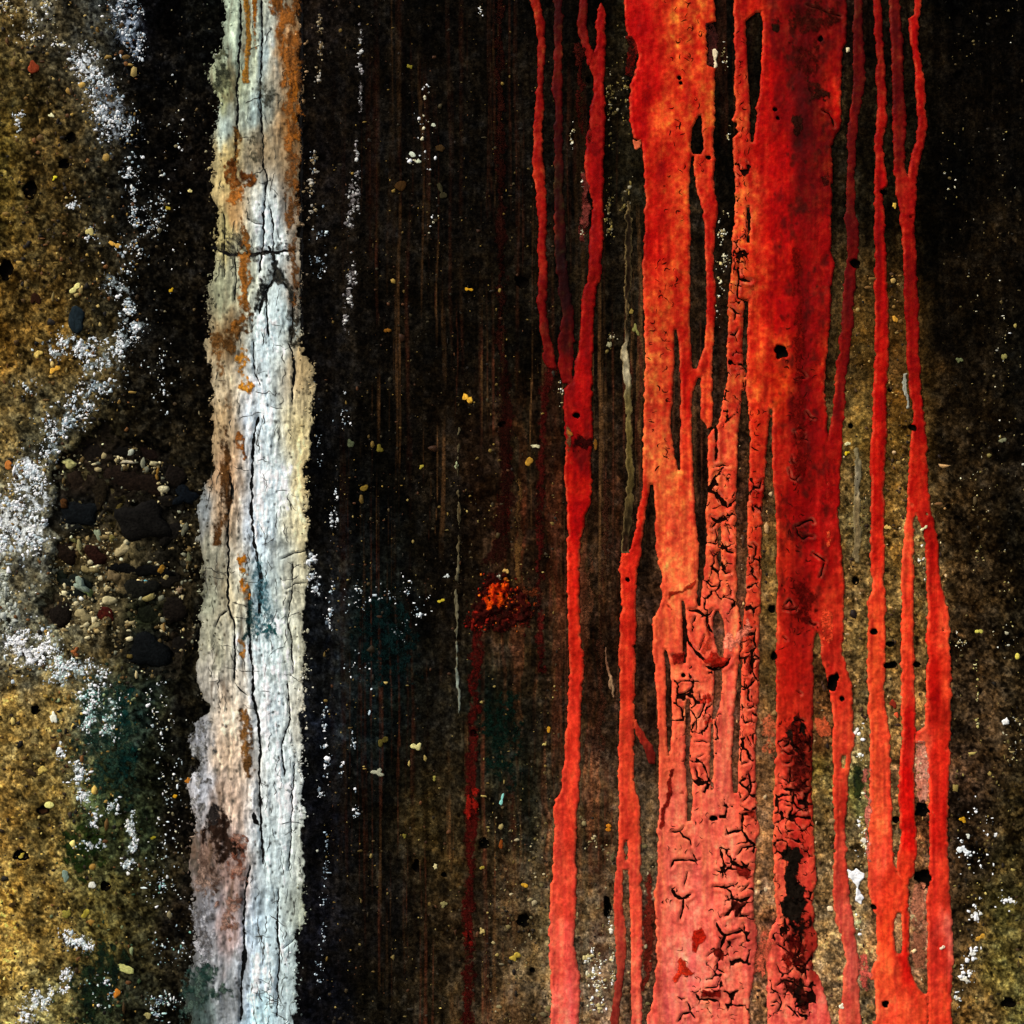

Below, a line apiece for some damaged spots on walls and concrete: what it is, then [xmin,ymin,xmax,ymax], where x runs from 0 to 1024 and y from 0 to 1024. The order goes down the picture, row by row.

crack [665,2,707,72]
rust [223,126,257,205]
rust [242,0,302,307]
rust [210,217,255,394]
damp [0,0,433,1024]
rust [213,398,247,546]
rust [237,554,251,600]
crack [204,0,308,1024]
crack [661,30,825,1021]
rust [238,708,255,778]